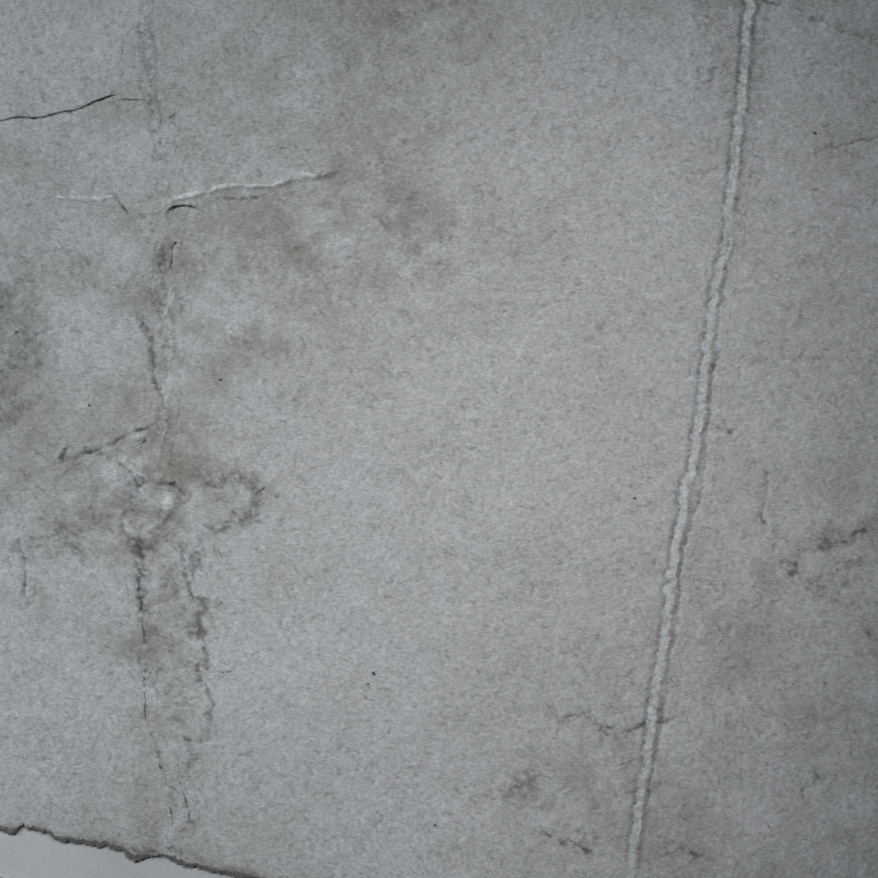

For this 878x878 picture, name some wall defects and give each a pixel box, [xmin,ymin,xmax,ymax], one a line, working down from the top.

crack [0,80,167,134]